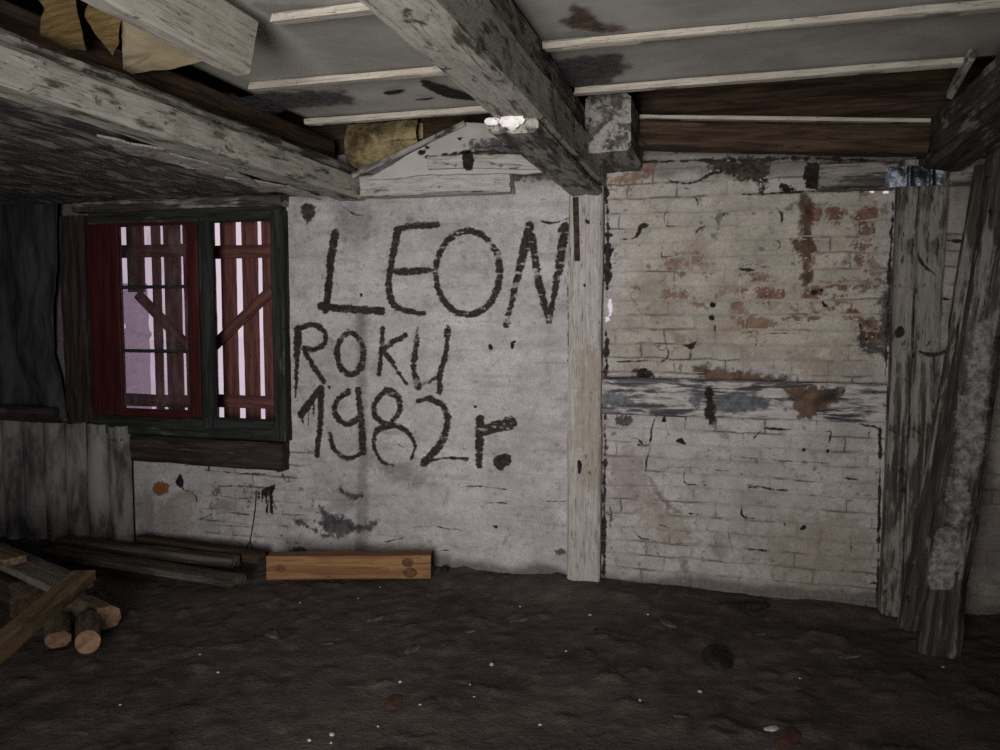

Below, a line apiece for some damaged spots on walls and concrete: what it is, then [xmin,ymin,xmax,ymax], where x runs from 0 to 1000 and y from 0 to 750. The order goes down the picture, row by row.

damp [558,6,624,33]
spalling [707,155,771,194]
spalling [779,162,818,193]
corrosion [792,193,816,286]
peeling [730,203,891,341]
peeling [661,289,716,332]
damp [349,521,377,533]